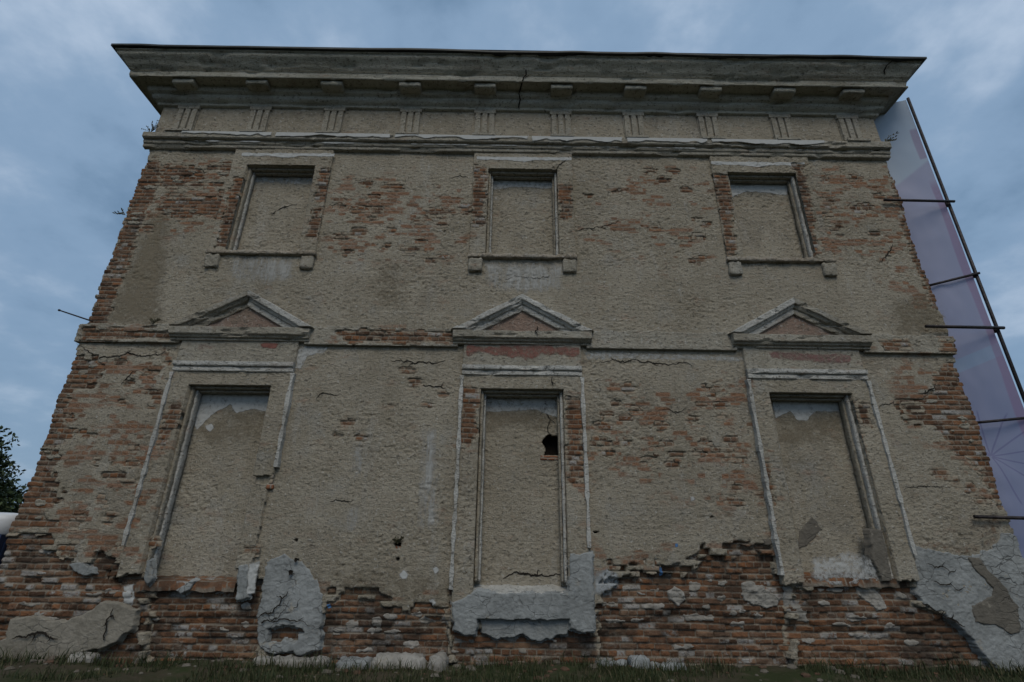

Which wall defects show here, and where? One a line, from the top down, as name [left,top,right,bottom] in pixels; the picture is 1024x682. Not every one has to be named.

crack [518,69,529,108]
crack [77,344,168,384]
crack [392,360,446,389]
crack [597,358,692,366]
spalling [0,131,1004,672]
crack [503,571,561,579]
crack [12,631,56,642]
crack [102,609,115,640]
crack [255,592,315,628]
crack [921,563,965,627]